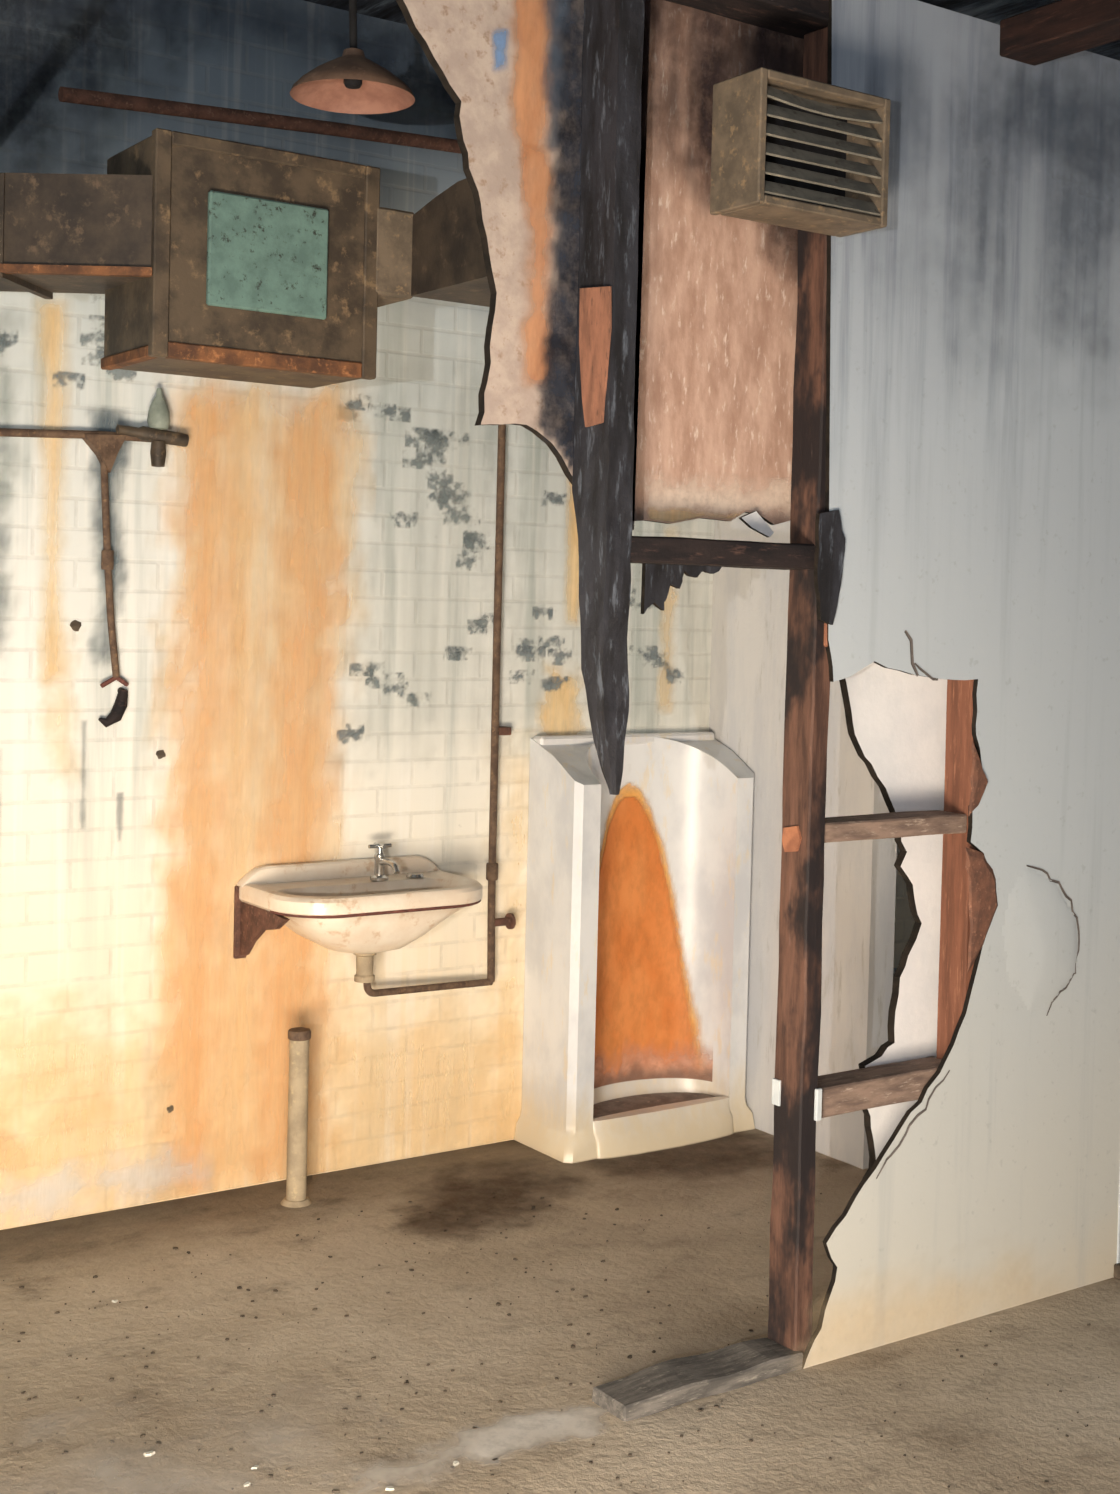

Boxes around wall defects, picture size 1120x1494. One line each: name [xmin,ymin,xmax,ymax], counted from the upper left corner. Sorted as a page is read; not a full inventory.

rust [513,0,552,381]
peeling [579,286,612,427]
peeling [513,636,571,690]
peeling [640,646,680,683]
spalling [969,741,988,816]
spalling [965,847,998,973]
crack [1026,865,1080,1016]